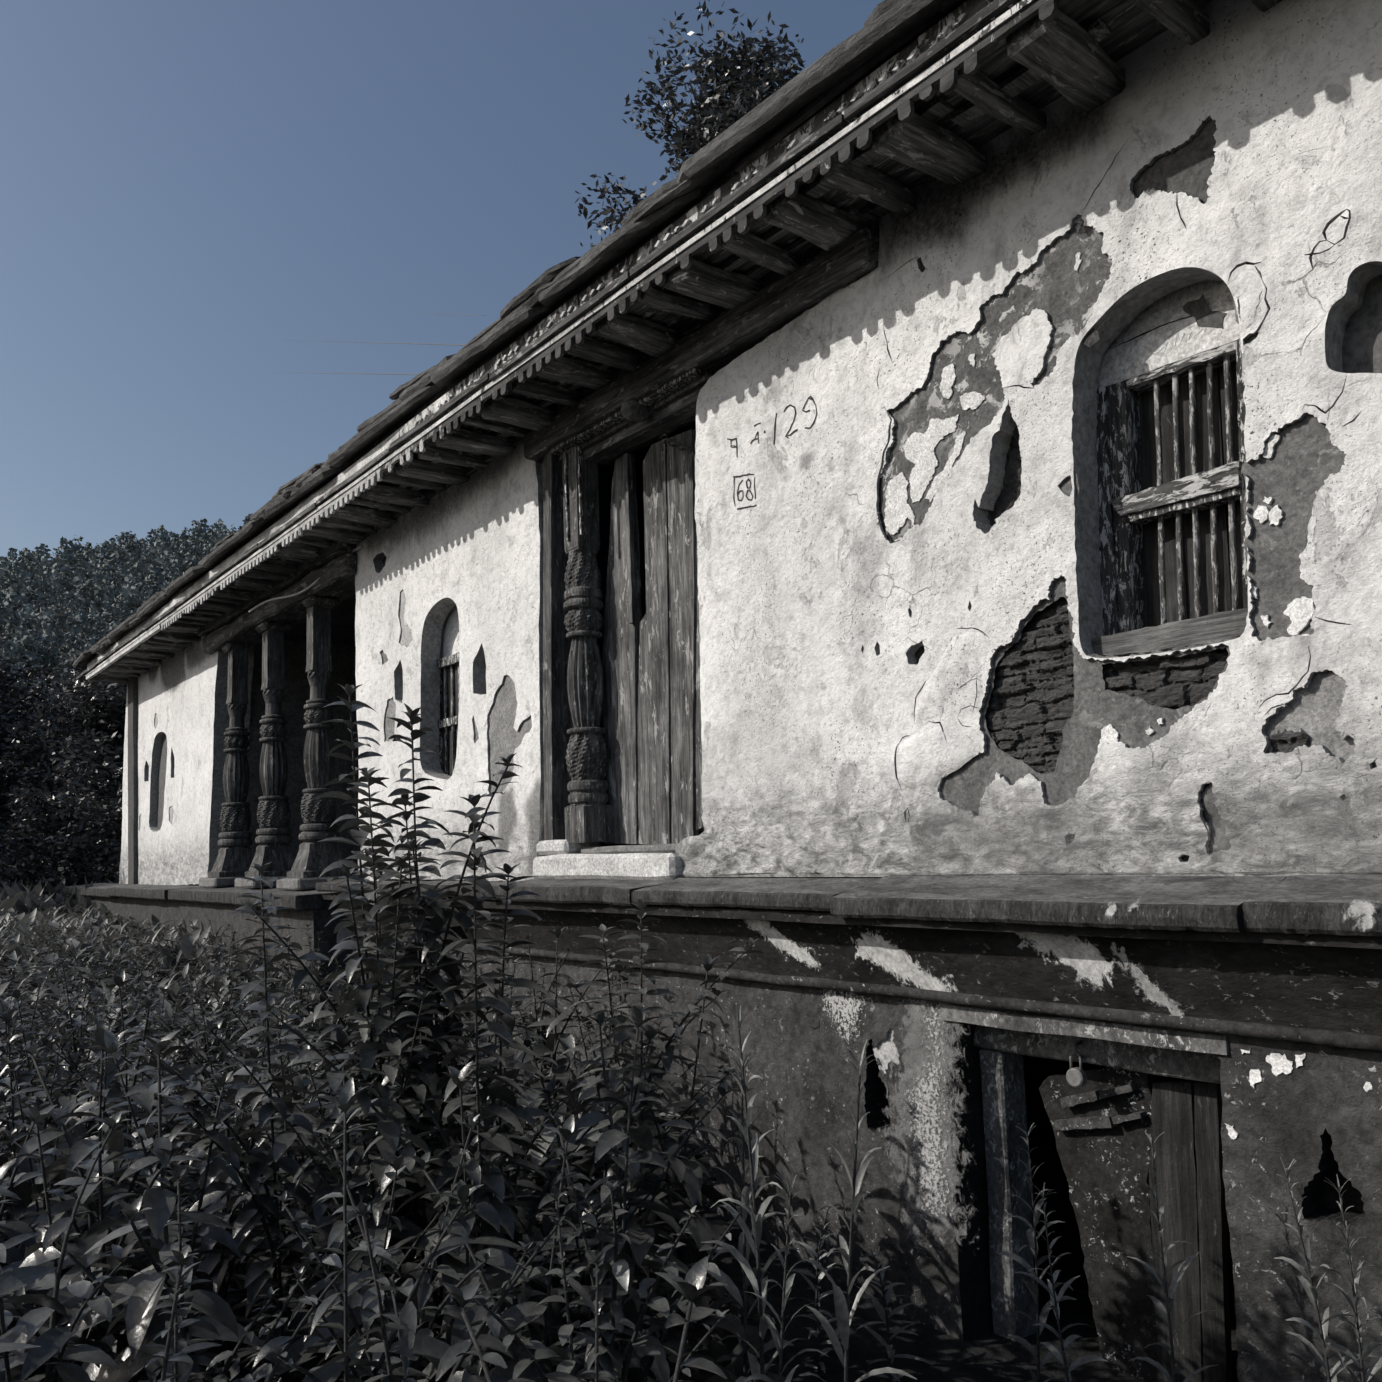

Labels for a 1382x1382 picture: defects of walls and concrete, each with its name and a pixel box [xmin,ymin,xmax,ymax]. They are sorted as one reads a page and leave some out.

flaking render [1132,118,1217,204]
flaking render [880,216,1112,542]
flaking render [1241,414,1346,641]
flaking render [473,675,532,794]
flaking render [940,576,1230,816]
flaking render [1200,783,1231,853]
flaking render [1265,670,1356,762]
leakage [850,928,978,1250]